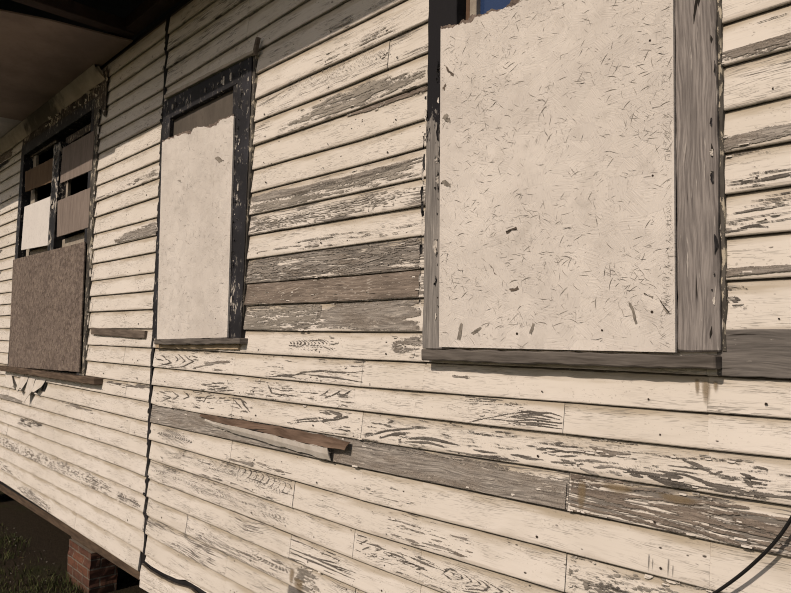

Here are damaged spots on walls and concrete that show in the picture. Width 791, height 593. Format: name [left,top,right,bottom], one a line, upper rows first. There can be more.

peeling [287,70,425,131]
peeling [248,96,450,254]
peeling [243,267,422,357]
peeling [107,349,356,440]
peeling [84,476,140,507]
peeling [358,396,791,501]
peeling [188,527,359,593]
peeling [356,498,510,593]